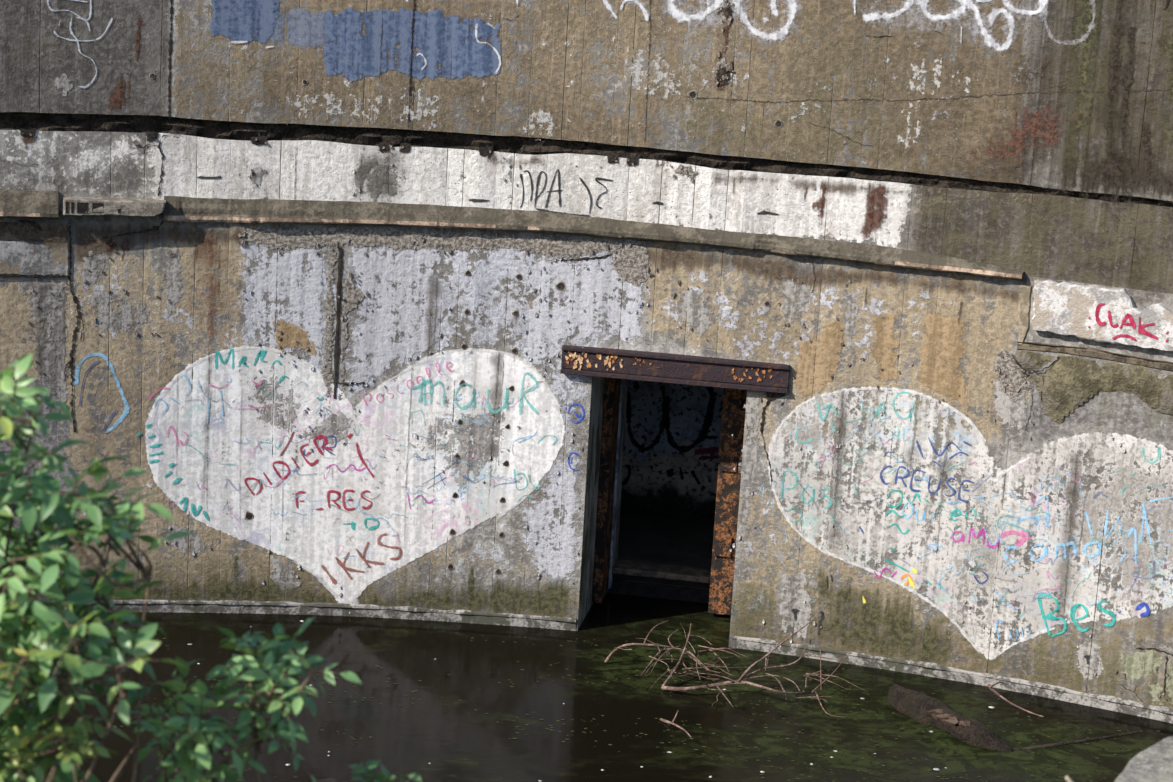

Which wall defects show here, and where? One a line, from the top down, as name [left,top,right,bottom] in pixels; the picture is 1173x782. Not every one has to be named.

water stain [1062,0,1173,199]
crack [0,219,84,432]
crack [105,219,164,243]
rust [860,185,888,238]